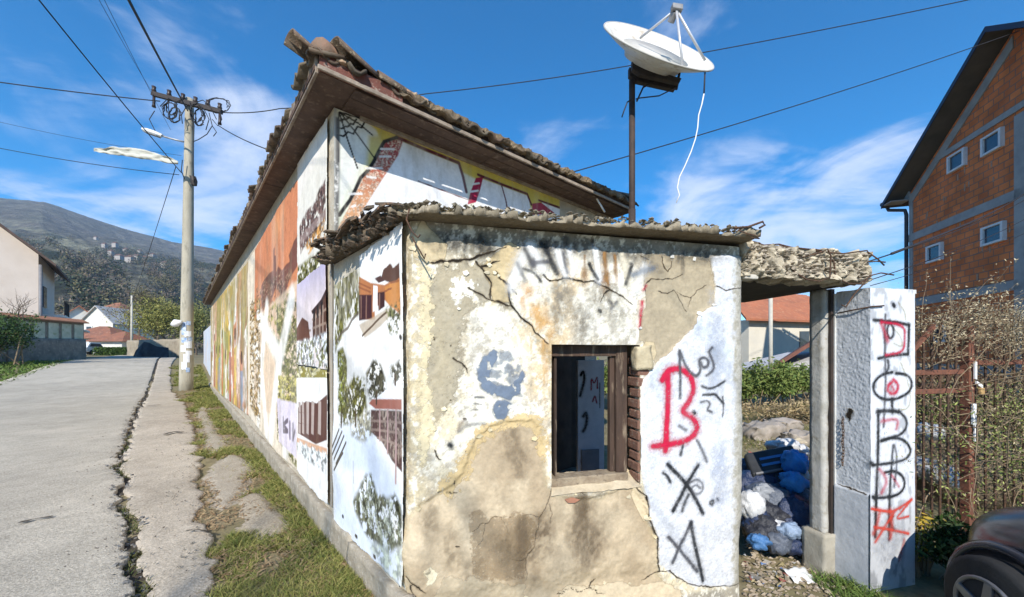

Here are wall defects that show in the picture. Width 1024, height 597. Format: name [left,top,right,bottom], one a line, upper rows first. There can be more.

peeling [406,209,522,467]
crack [430,247,548,344]
crack [543,256,741,312]
spalling [733,221,894,307]
peeling [402,413,682,597]
leakage [573,498,599,554]